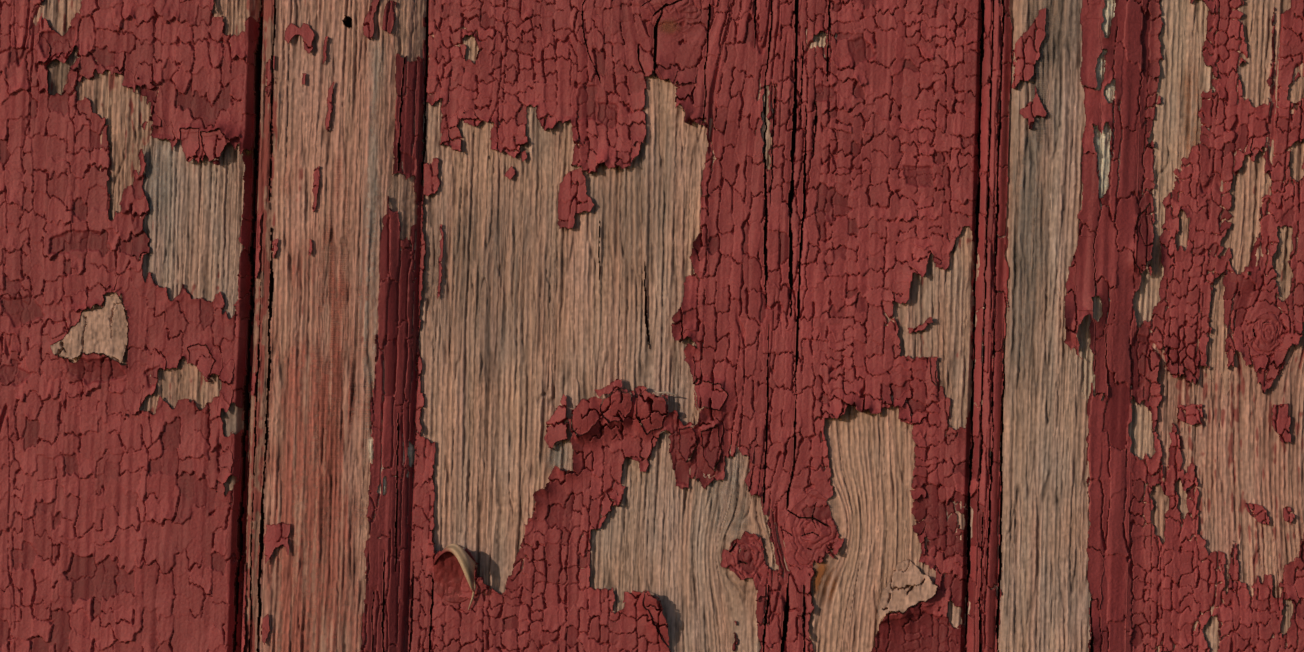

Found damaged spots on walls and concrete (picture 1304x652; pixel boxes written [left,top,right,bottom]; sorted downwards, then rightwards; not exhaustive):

crack [233,0,276,652]
crack [371,413,434,652]
crack [397,0,429,185]
peeling [33,0,973,652]
crack [643,262,651,349]
crack [637,0,711,127]
crack [729,543,807,652]
crack [754,0,833,551]
crack [964,0,1005,652]
peeling [883,0,1121,652]
crack [1088,598,1096,652]
peeling [1122,0,1304,652]